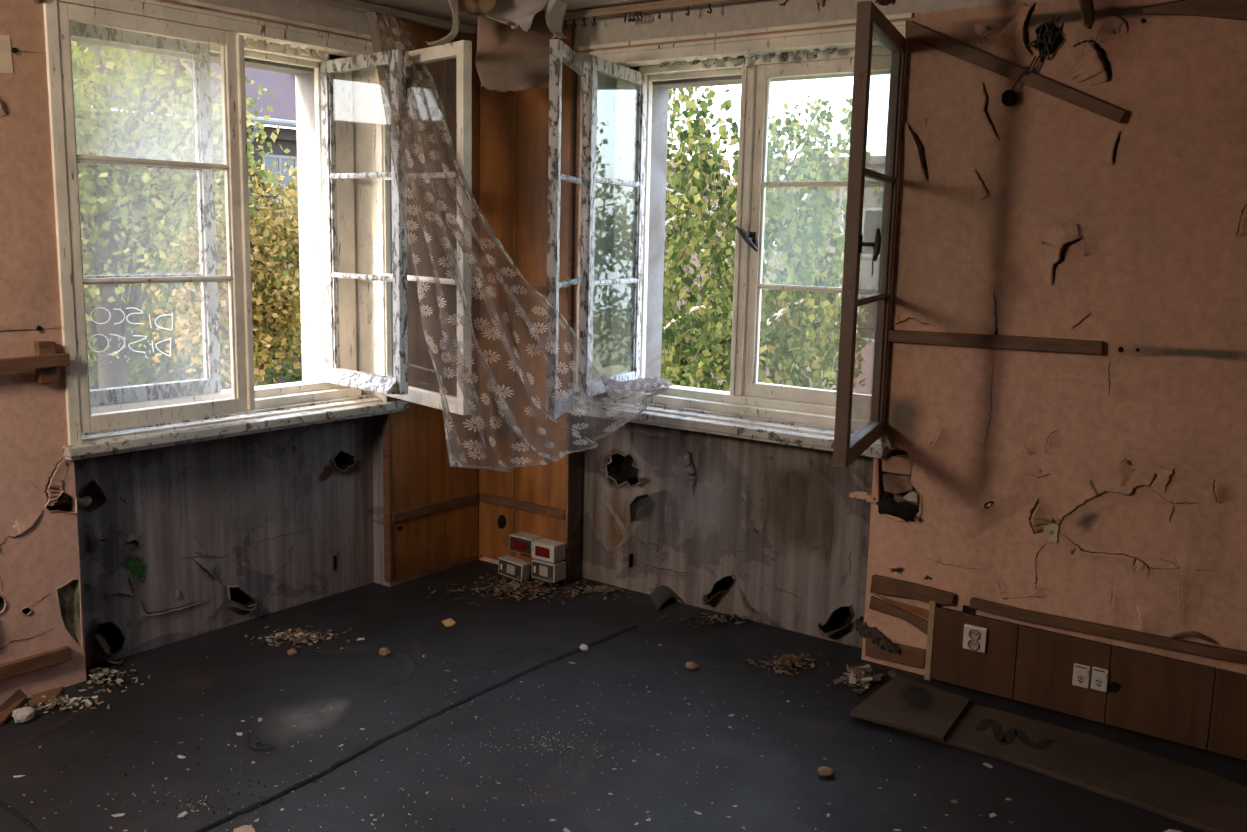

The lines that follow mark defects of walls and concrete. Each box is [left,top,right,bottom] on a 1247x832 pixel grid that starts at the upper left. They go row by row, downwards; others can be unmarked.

peeling [1037,222,1099,286]
spalling [605,451,656,524]
spalling [875,443,923,522]
spalling [56,577,127,666]
spalling [194,556,259,615]
spalling [702,574,736,607]